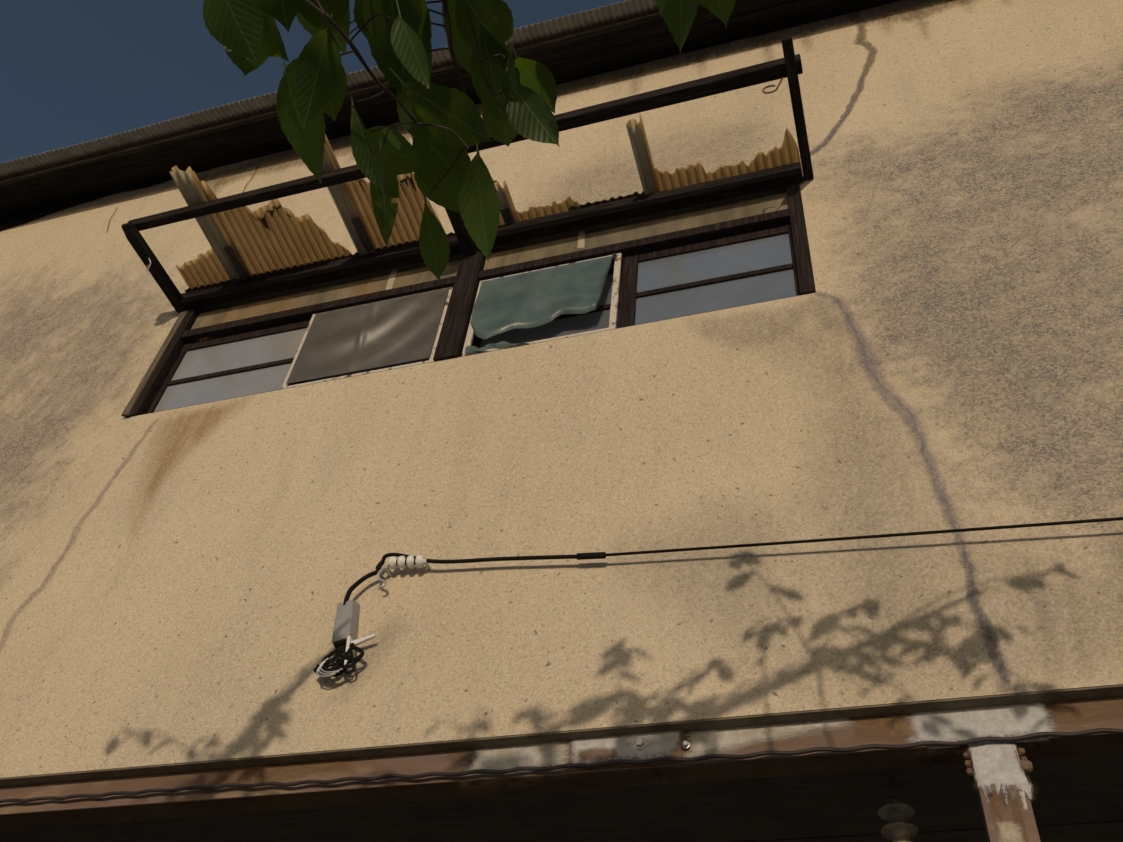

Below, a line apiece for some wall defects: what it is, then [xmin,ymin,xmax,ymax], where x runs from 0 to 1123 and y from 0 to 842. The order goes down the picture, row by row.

crack [810,11,877,153]
mould [847,66,1123,514]
crack [816,292,1006,680]
peeling [470,702,1056,842]